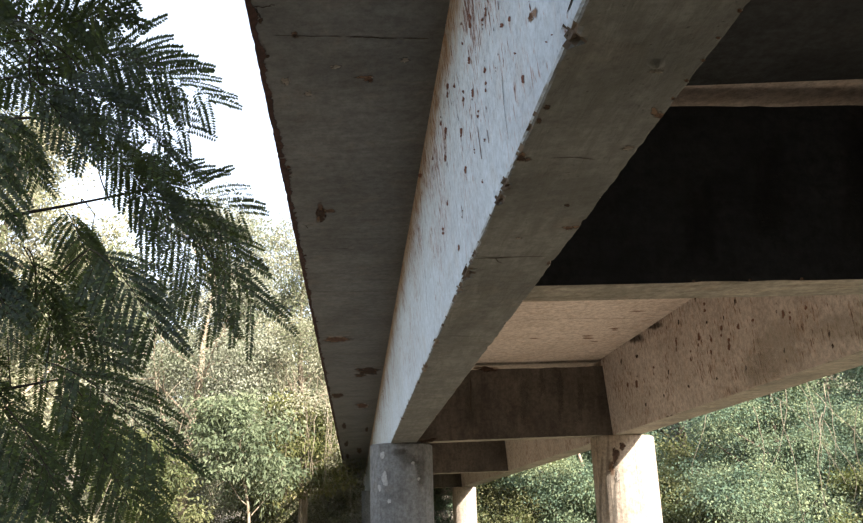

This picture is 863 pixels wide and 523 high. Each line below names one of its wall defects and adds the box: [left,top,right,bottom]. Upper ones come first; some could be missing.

crack [276,33,428,41]
rust [425,73,489,166]
rust [244,0,343,461]